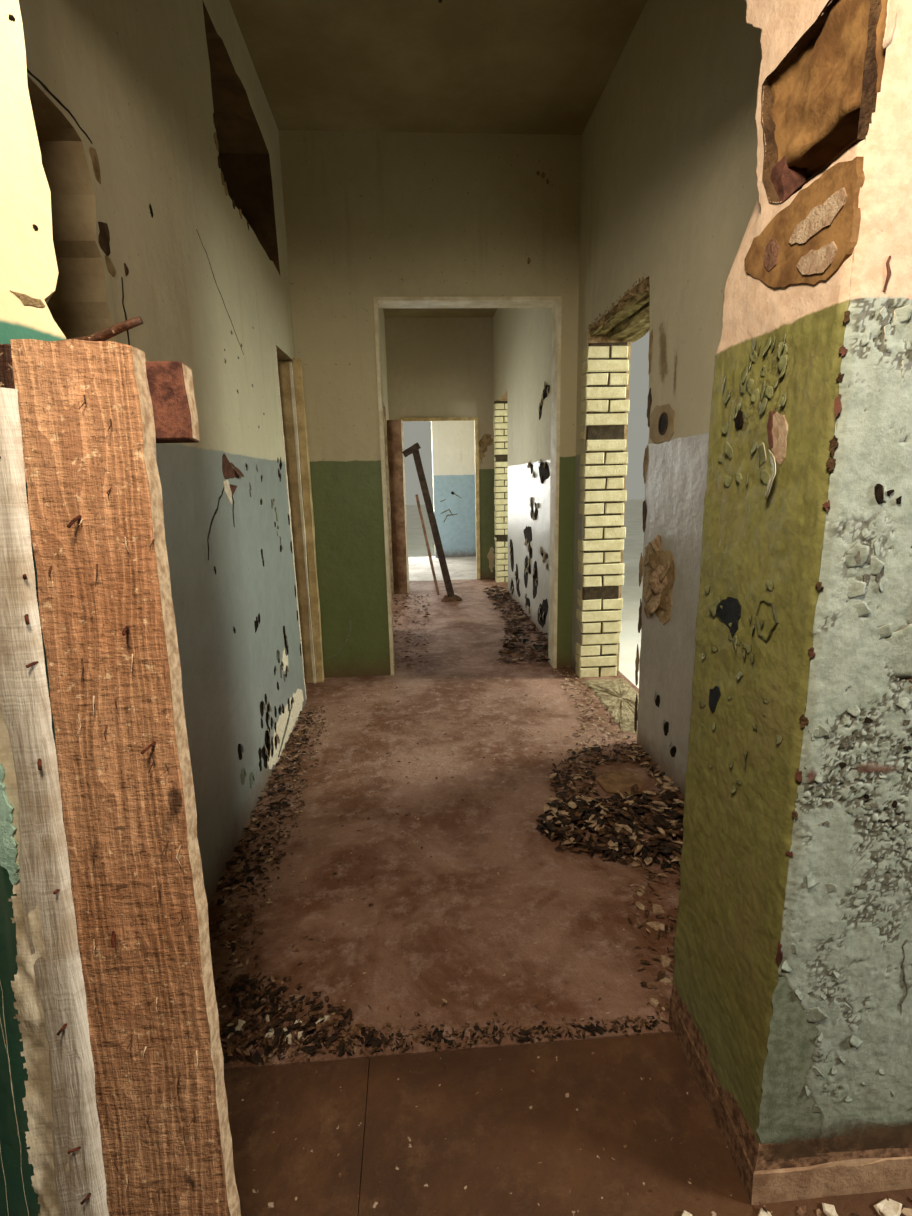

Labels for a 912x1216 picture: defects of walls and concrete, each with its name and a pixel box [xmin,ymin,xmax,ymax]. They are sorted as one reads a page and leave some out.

spalling [744,0,897,288]
peeling [10,290,45,308]
peeling [527,460,550,484]
peeling [718,334,788,500]
spalling [826,435,839,471]
peeling [874,484,902,504]
peeling [222,346,306,788]
peeling [487,497,558,640]
spalling [634,500,676,732]
spalling [704,585,764,680]
peeling [756,941,852,1144]
crack [900,940,912,1015]